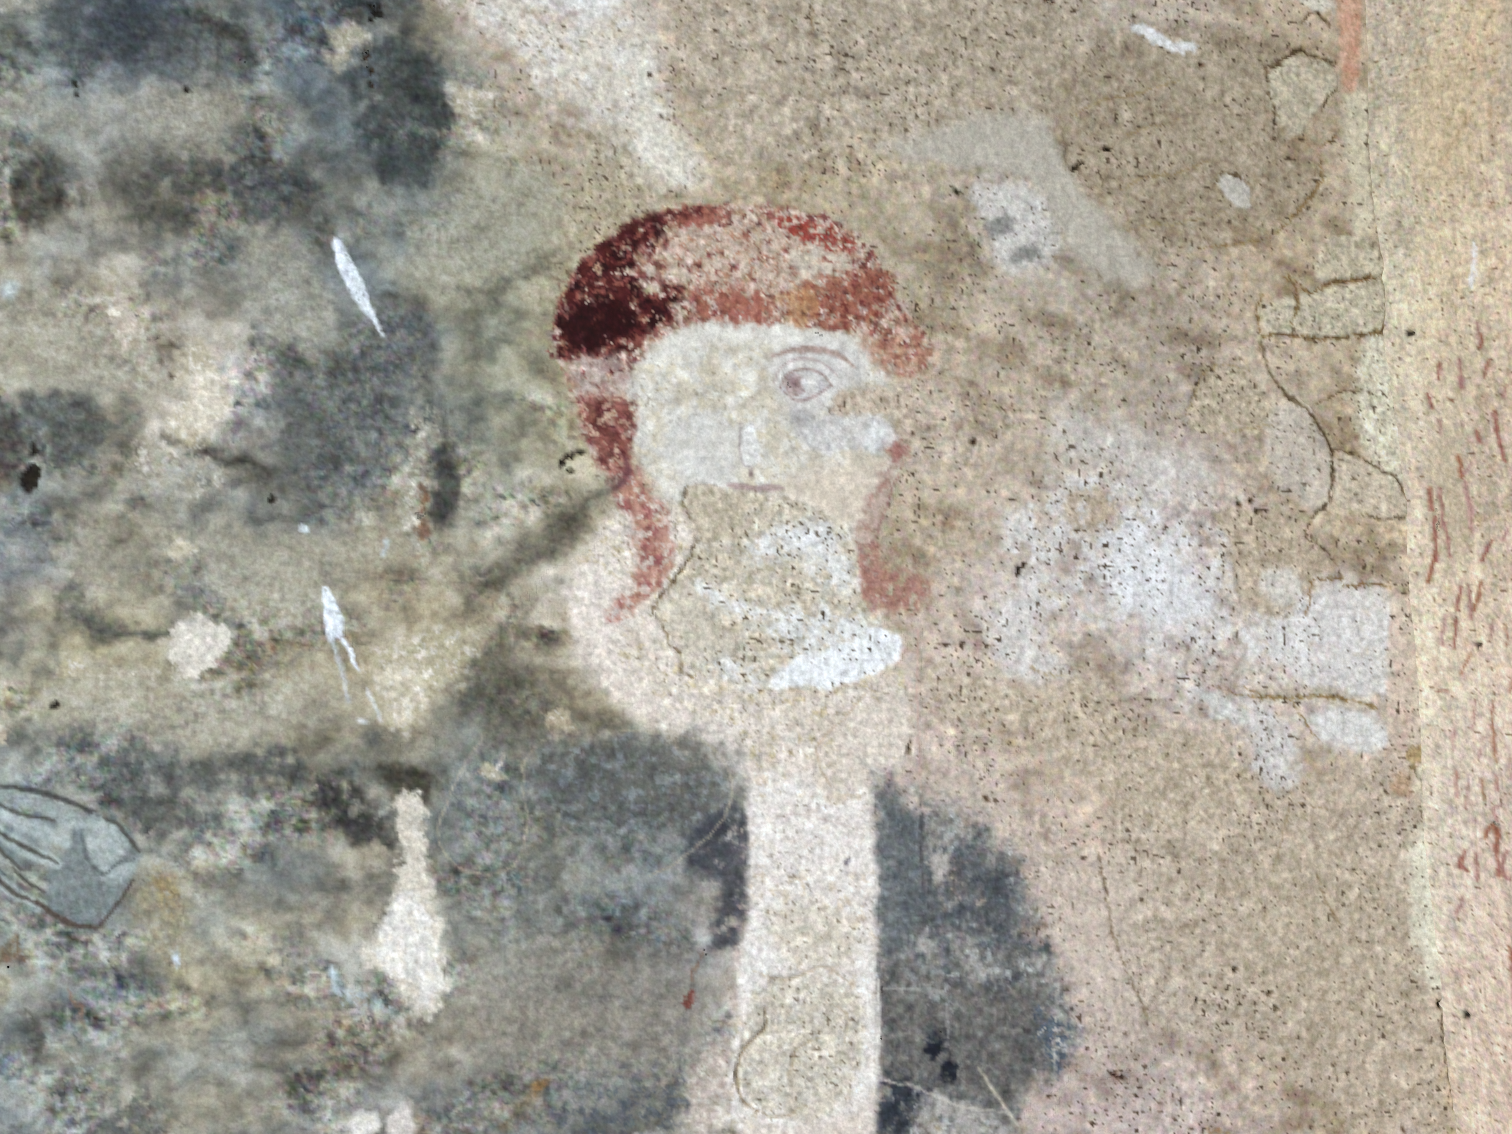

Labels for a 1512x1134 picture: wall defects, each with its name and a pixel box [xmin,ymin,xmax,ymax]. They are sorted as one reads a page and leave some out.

damp [0,0,268,183]
damp [0,256,175,419]
damp [216,210,360,371]
crack [1182,9,1407,618]
damp [2,485,432,784]